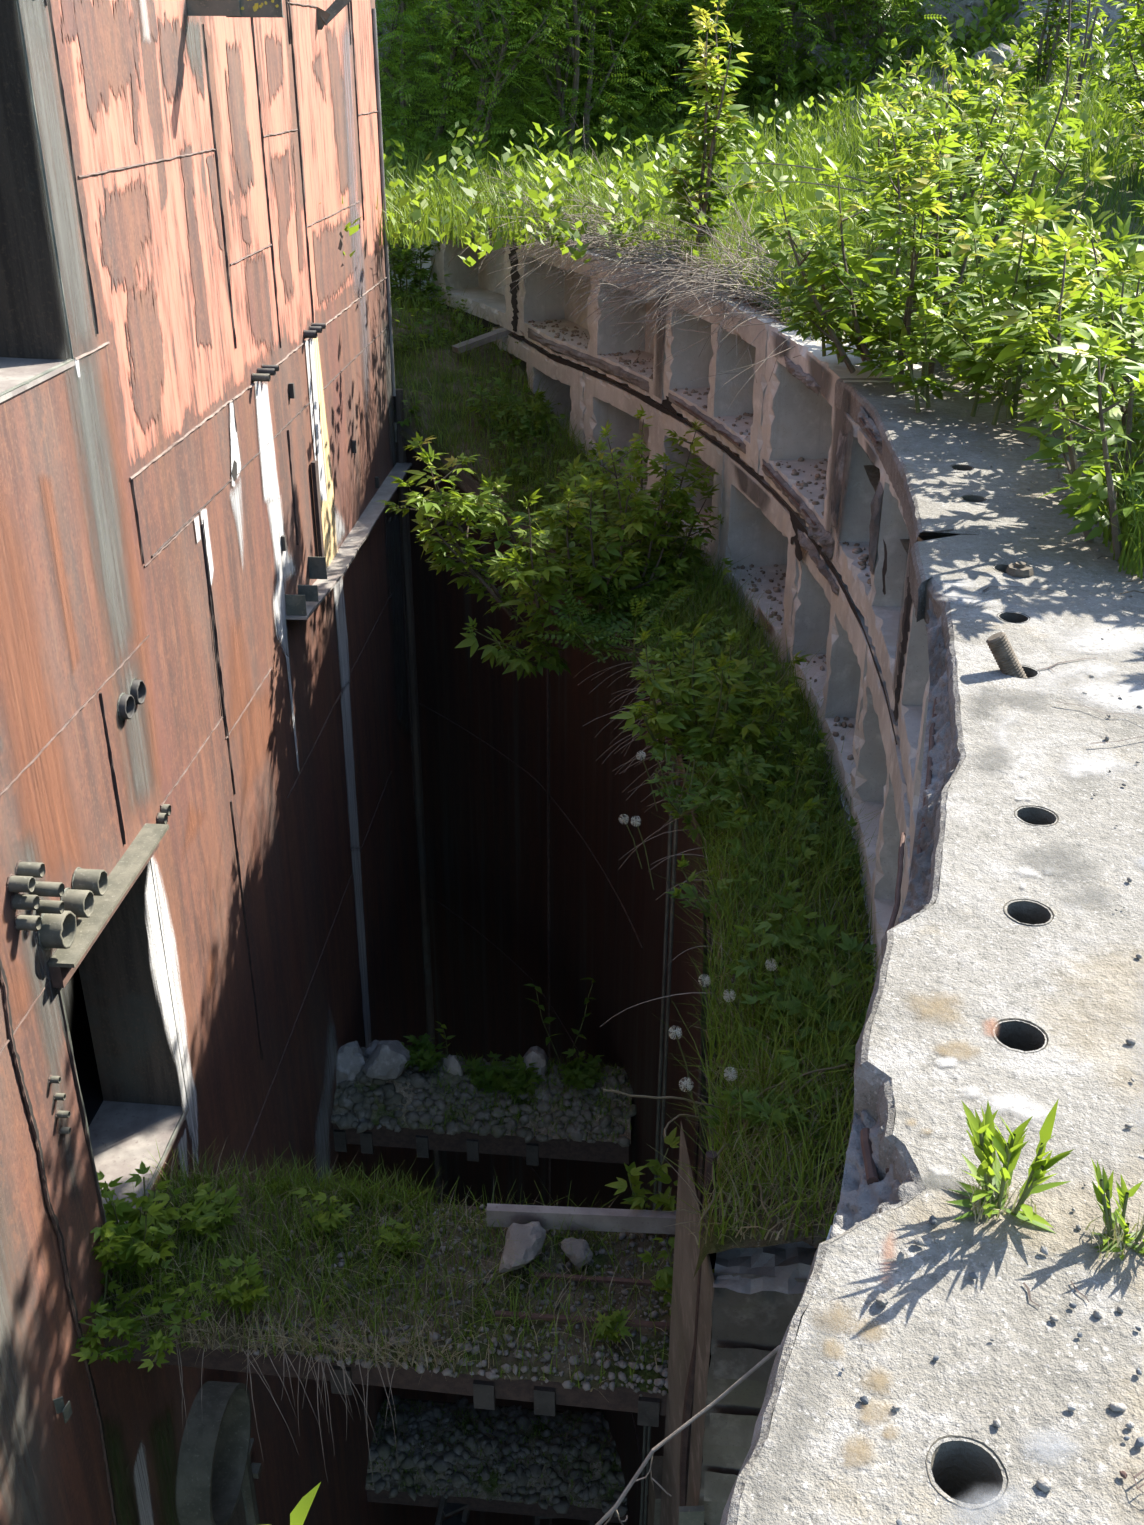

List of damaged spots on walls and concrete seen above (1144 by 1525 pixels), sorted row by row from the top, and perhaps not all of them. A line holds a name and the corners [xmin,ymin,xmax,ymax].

water stain [21,0,130,652]
peeling [96,173,167,440]
peeling [61,0,205,144]
peeling [180,25,355,355]
water stain [194,509,214,585]
water stain [230,403,242,548]
water stain [255,381,300,774]
crack [790,518,803,562]
crack [882,539,912,724]
spalling [885,586,966,933]
spalling [830,1083,925,1241]
water stain [0,1270,46,1525]